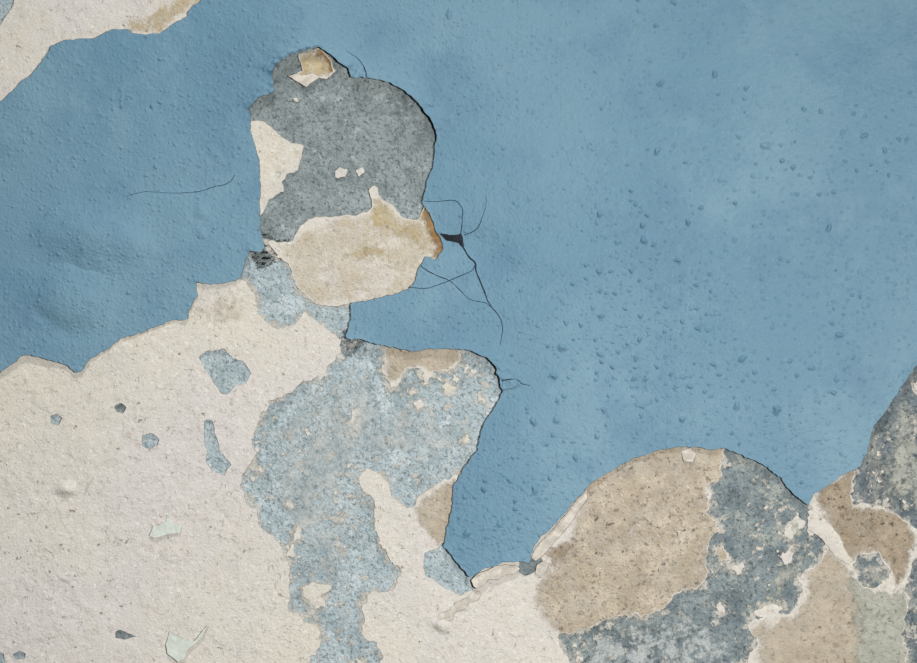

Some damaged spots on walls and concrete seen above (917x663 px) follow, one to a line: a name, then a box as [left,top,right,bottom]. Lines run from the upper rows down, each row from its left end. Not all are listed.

spalling [0,0,14,25]
crack [409,195,503,344]
spalling [199,349,251,394]
peeling [239,47,503,663]
peeling [850,366,917,529]
peeling [558,448,825,663]
peeling [853,552,891,588]
peeling [901,543,917,663]